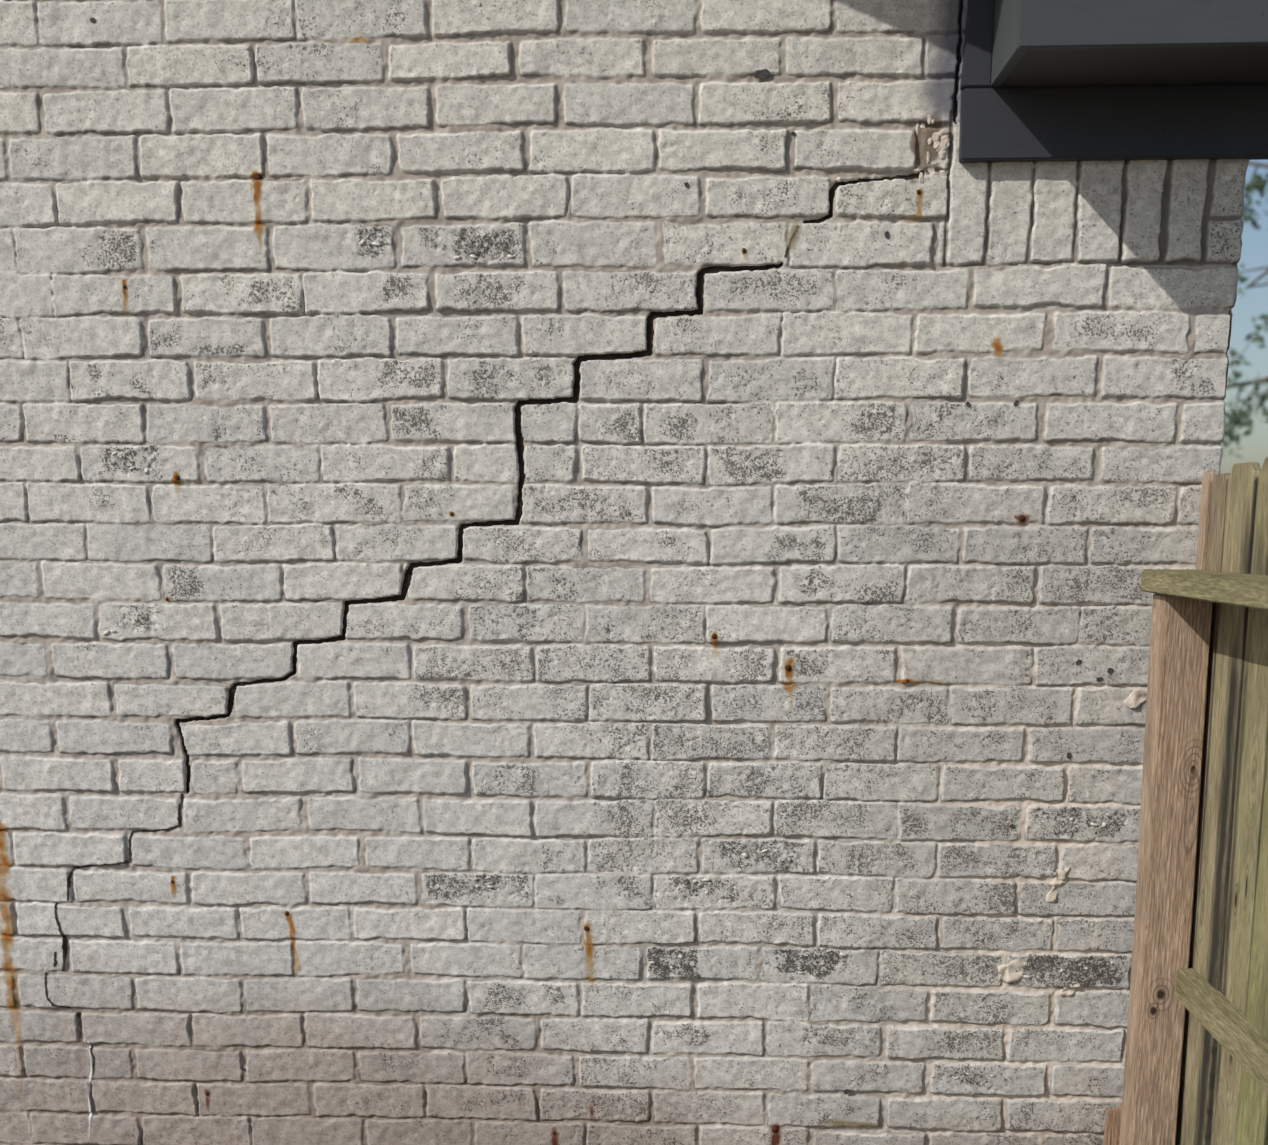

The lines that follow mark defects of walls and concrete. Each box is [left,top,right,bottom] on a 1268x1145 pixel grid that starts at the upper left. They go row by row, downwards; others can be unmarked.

crack [953,0,963,124]
spalling [910,114,950,183]
corrosion [251,171,263,239]
crack [44,171,924,1130]
corrosion [783,658,795,691]
corrosion [0,822,18,1012]
corrosion [284,911,298,972]
corrosion [584,924,593,983]
corrosion [770,1124,780,1145]